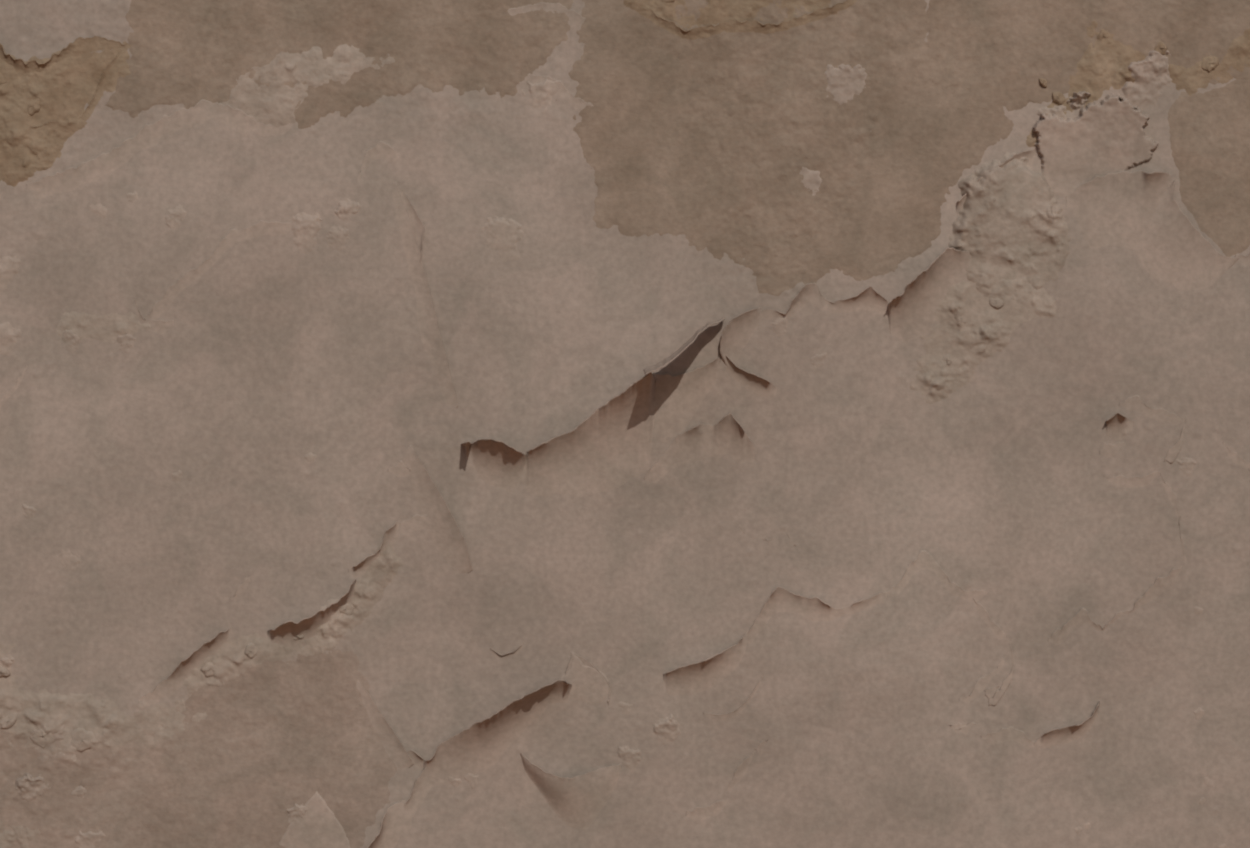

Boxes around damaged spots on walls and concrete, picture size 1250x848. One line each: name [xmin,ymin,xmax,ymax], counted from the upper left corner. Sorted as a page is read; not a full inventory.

flaking render [0,0,1250,497]
flaking render [0,521,399,848]
peeling [422,651,621,830]
peeling [663,586,889,695]
peeling [1034,701,1100,750]